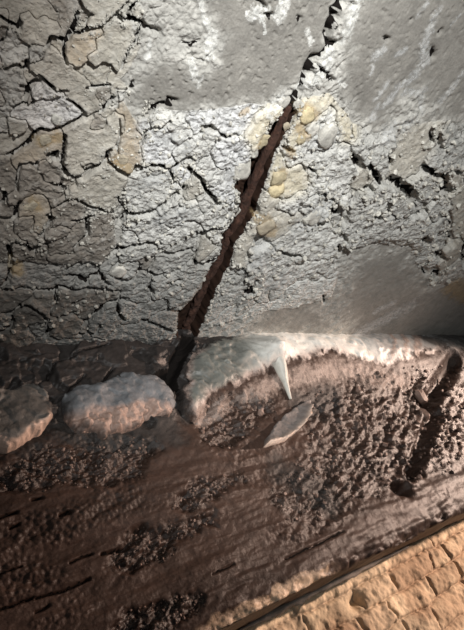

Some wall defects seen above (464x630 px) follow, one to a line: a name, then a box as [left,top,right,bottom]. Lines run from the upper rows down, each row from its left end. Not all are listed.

crack [0,15,20,28]
crack [48,2,158,62]
crack [2,59,82,217]
crack [118,196,163,219]
peeling [0,0,464,347]
crack [139,0,342,425]
crack [351,153,423,203]
crack [421,165,460,193]
crack [4,241,153,300]
water stain [51,332,464,453]
spalling [267,354,464,522]
water stain [268,455,340,518]